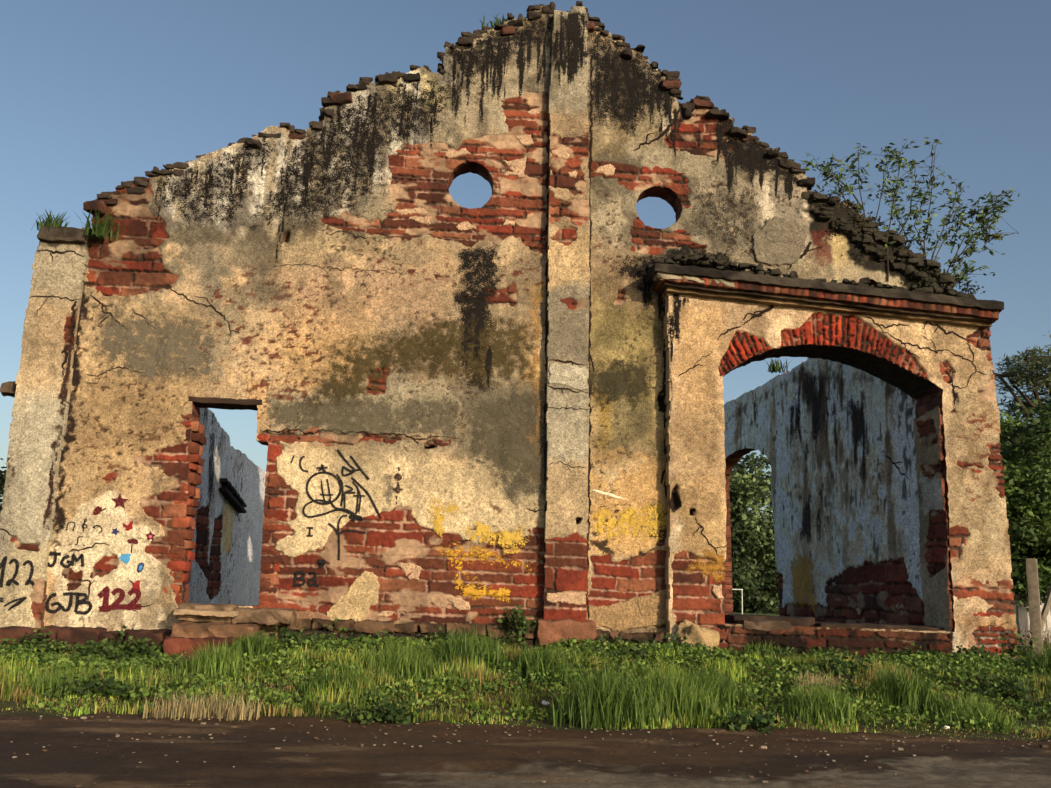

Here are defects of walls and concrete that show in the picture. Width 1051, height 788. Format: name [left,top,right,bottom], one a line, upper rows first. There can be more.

water stain [151,11,677,273]
spalling [321,92,690,255]
crack [36,249,84,262]
spalling [86,177,179,296]
crack [167,288,239,345]
water stain [266,243,547,504]
crack [527,56,594,618]
water stain [780,368,872,474]
spalling [718,312,956,387]
crack [867,317,989,406]
spalling [252,427,1019,658]
water stain [790,491,825,611]